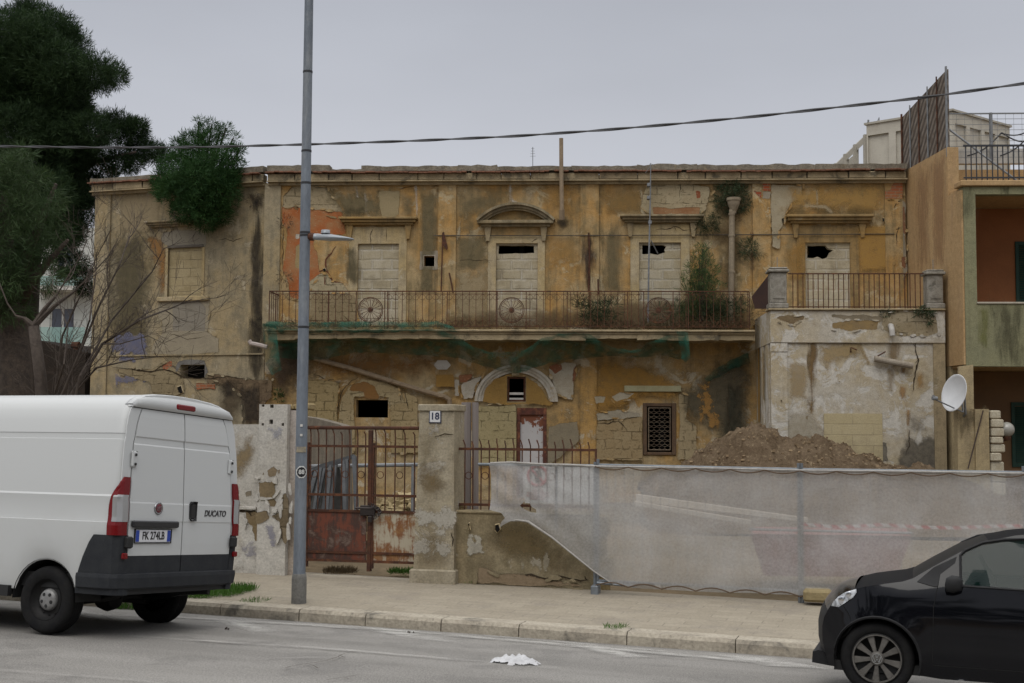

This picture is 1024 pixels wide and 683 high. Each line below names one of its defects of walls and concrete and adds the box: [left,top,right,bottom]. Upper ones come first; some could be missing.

flaking render [641,184,715,214]
flaking render [754,183,805,249]
flaking render [280,186,360,324]
crack [319,246,341,284]
leakage [249,185,455,399]
flaking render [777,314,807,326]
flaking render [822,310,941,363]
flaking render [549,360,577,400]
crack [912,343,920,390]
leakage [883,420,935,468]
flaking render [236,444,293,544]
flaking render [473,567,583,590]